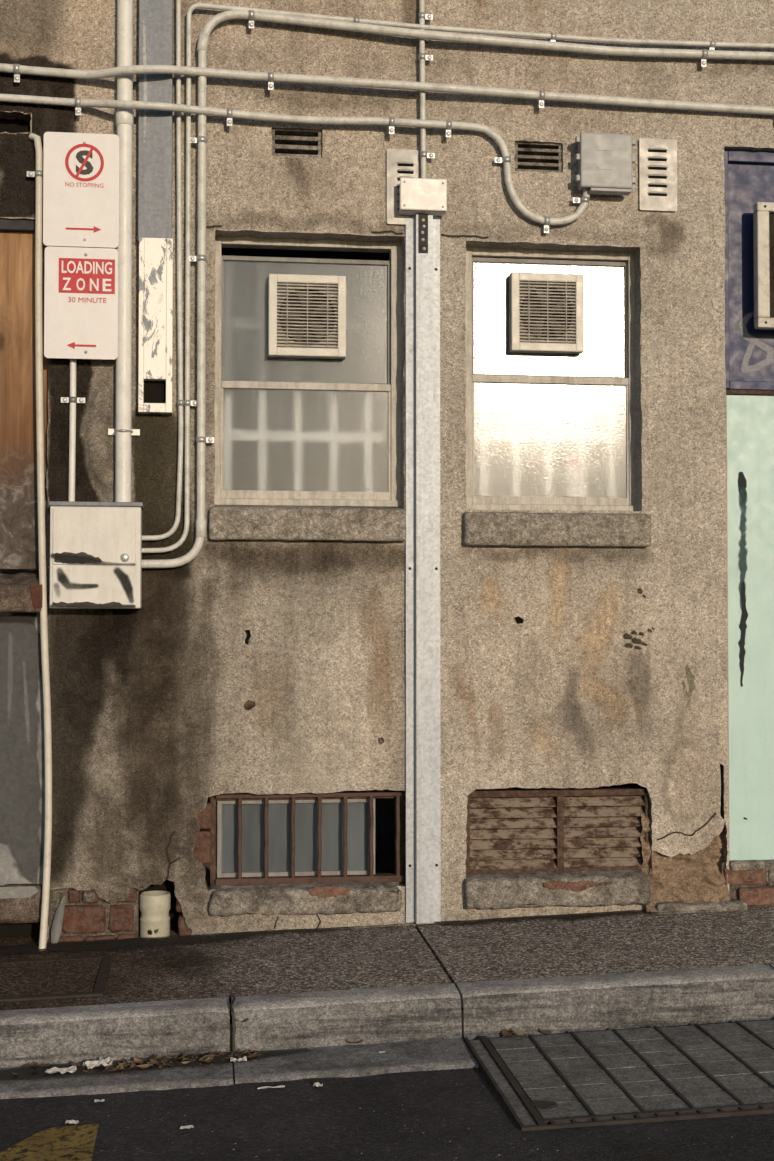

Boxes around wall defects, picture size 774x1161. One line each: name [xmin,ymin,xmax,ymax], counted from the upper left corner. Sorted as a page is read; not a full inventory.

water stain [0,0,76,217]
peeling [0,613,192,943]
water stain [49,410,406,882]
water stain [564,673,586,739]
crack [657,813,716,840]
spalling [640,812,747,914]